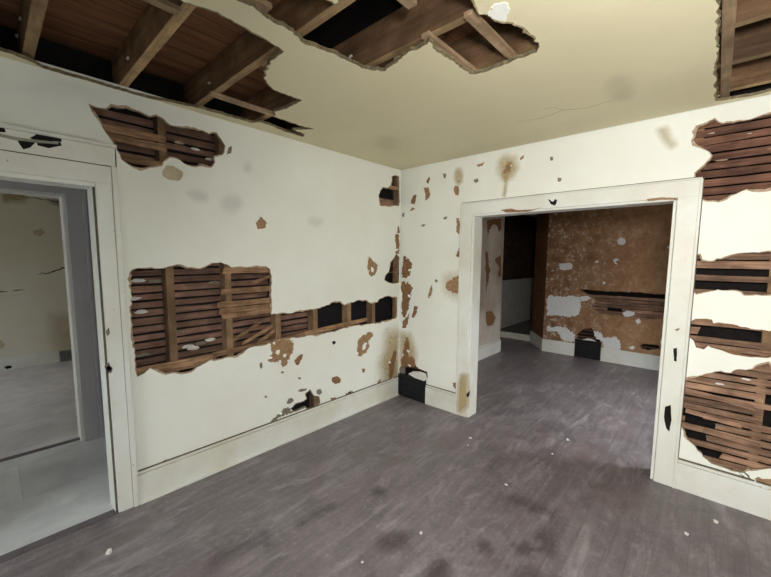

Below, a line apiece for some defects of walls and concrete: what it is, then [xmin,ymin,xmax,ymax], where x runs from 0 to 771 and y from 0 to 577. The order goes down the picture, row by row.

peeling [487,2,510,21]
spalling [88,103,232,171]
spalling [691,112,771,202]
spalling [379,175,400,207]
peeling [402,177,430,217]
spalling [694,250,771,296]
spalling [127,226,428,383]
spalling [579,289,666,320]
spalling [577,328,601,342]
spalling [682,319,771,490]